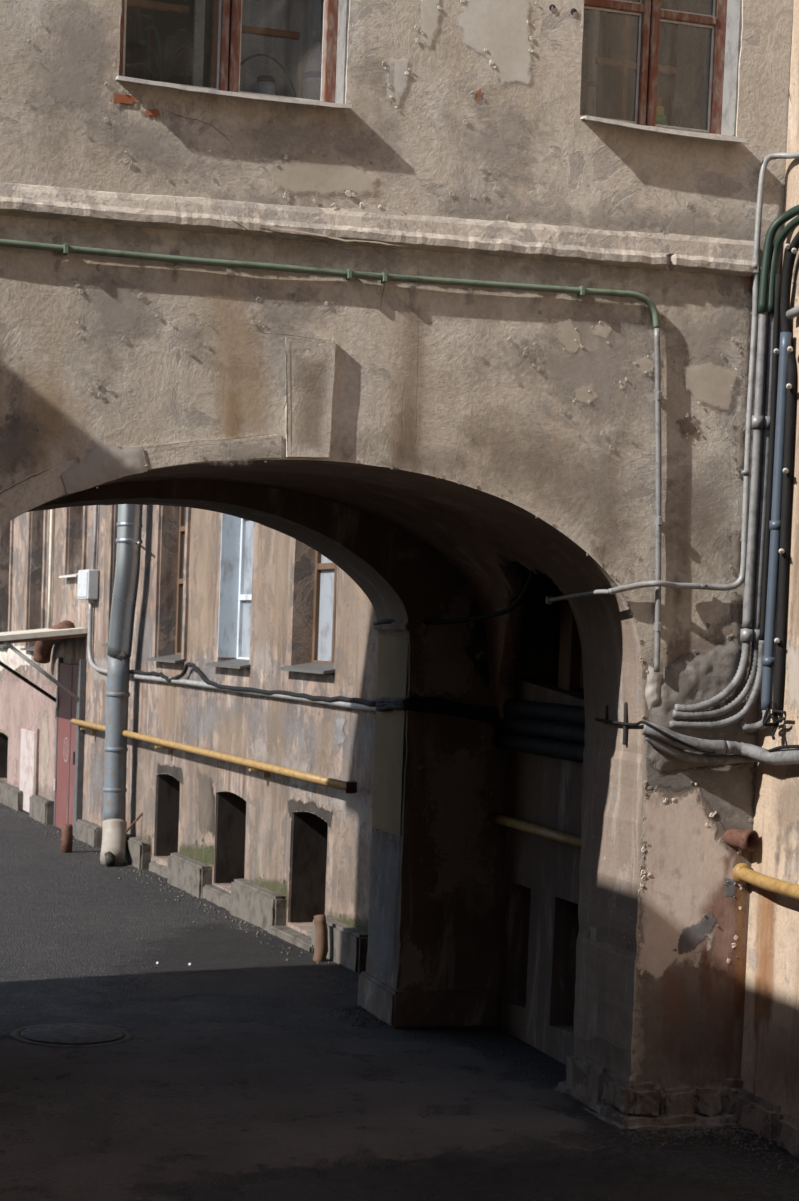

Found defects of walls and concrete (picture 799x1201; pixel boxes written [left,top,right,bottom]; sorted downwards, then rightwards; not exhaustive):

peeling [384,56,411,108]
peeling [414,0,441,47]
peeling [457,0,556,85]
peeling [248,150,377,210]
peeling [677,277,753,476]
flaking render [638,533,760,735]
flaking render [624,745,757,1090]